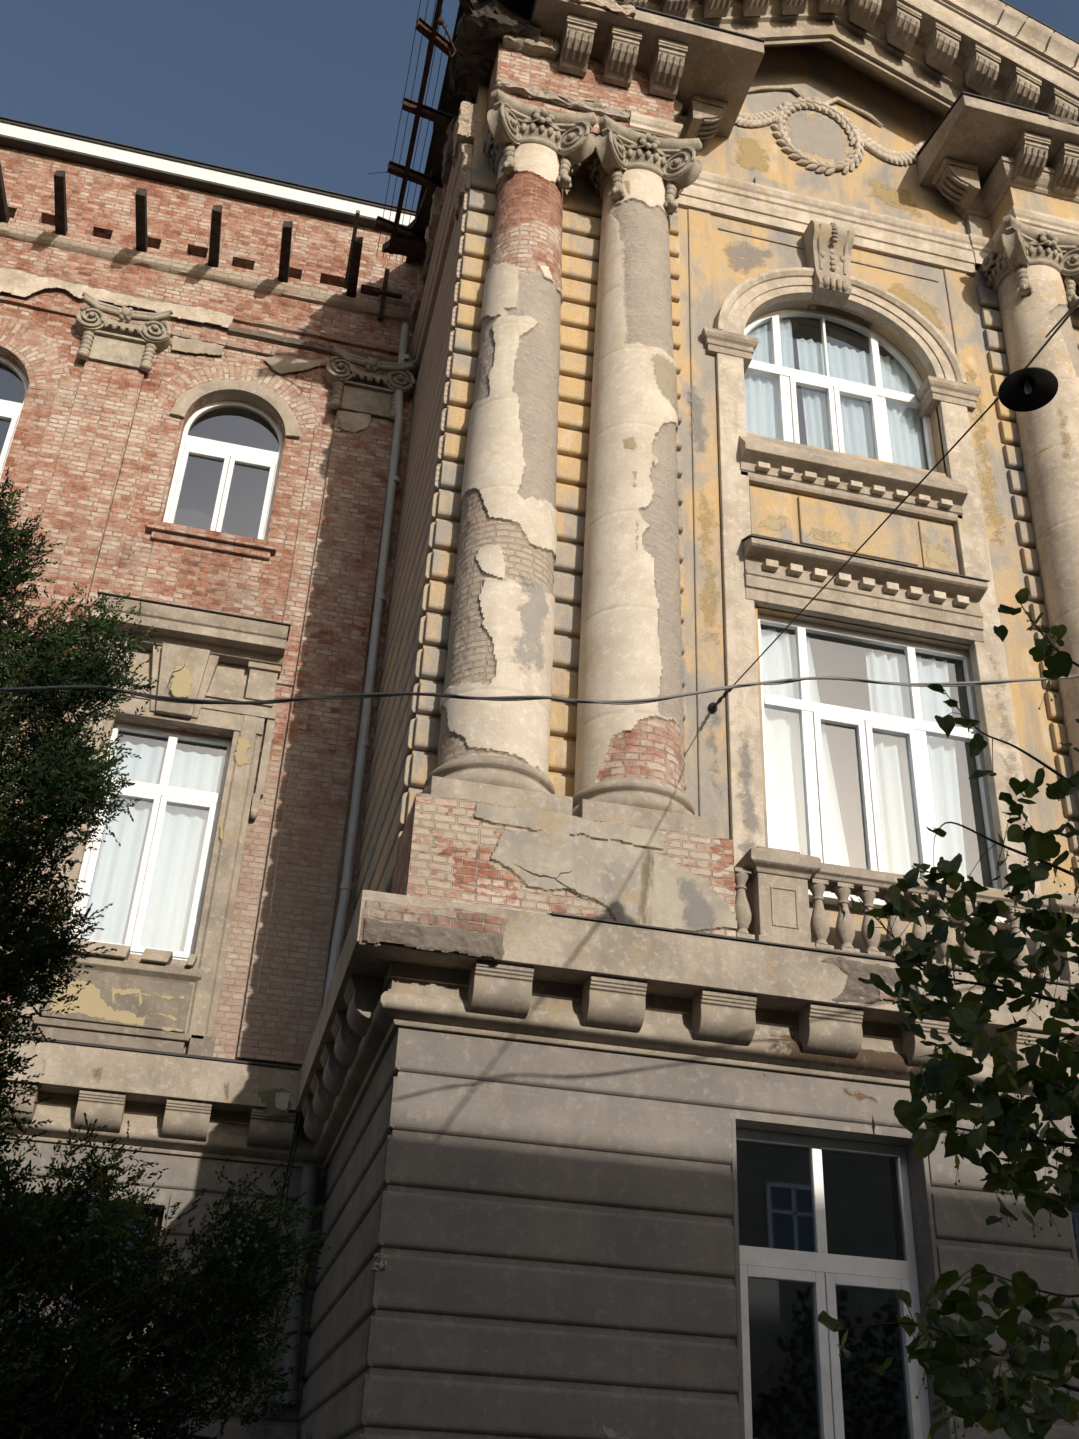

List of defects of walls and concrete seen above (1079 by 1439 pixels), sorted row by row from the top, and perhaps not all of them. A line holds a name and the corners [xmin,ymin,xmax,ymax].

flaking render [0,268,233,328]
flaking render [171,336,225,355]
flaking render [473,170,564,510]
flaking render [436,487,556,775]
flaking render [595,421,685,794]
peeling [699,495,720,643]
flaking render [359,793,737,961]
crack [515,864,592,901]
peeling [49,976,184,1032]